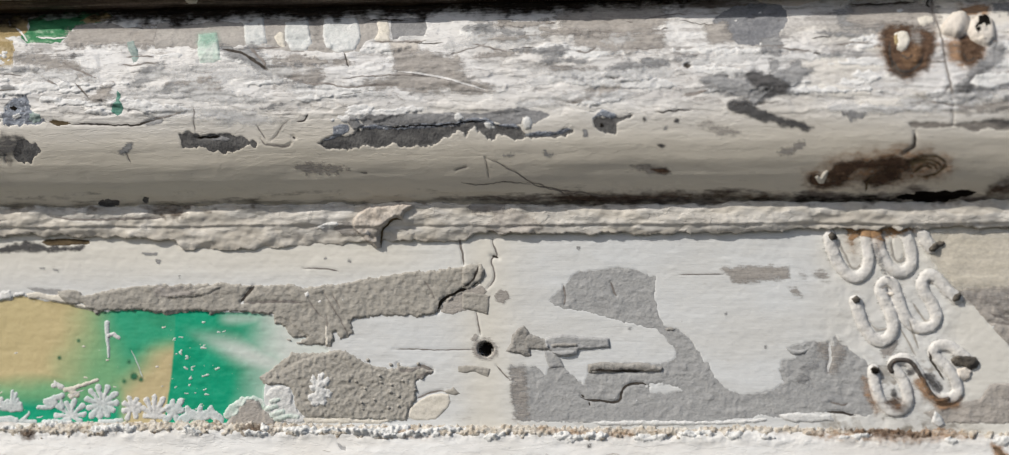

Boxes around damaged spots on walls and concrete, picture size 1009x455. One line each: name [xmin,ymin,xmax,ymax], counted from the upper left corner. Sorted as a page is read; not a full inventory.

peeling [0,13,677,164]
peeling [671,3,1009,132]
corrosion [881,23,935,79]
corrosion [947,35,996,66]
crack [465,159,624,197]
corrosion [809,132,952,191]
crack [437,239,498,312]
crack [400,313,480,350]
peeling [0,290,474,452]
corrosion [865,389,906,413]
corrosion [907,369,959,409]
peeling [553,418,776,444]